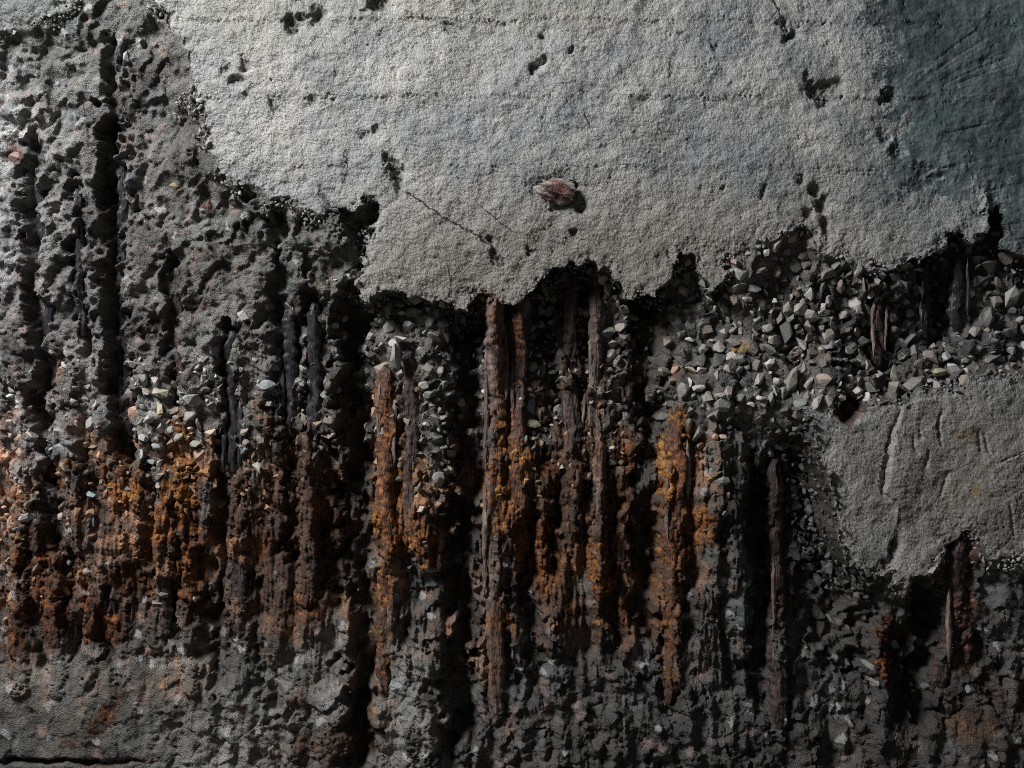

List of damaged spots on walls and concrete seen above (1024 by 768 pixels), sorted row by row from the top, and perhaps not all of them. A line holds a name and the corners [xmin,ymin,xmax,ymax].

hole [282,5,328,37]
hole [382,153,407,199]
spalling [868,299,889,367]
spalling [916,260,932,340]
spalling [945,251,970,332]
rust [0,403,213,667]
rust [223,424,347,636]
rust [367,388,444,670]
rust [475,317,643,640]
rust [648,406,718,655]
spalling [929,538,971,693]
rust [929,531,985,670]